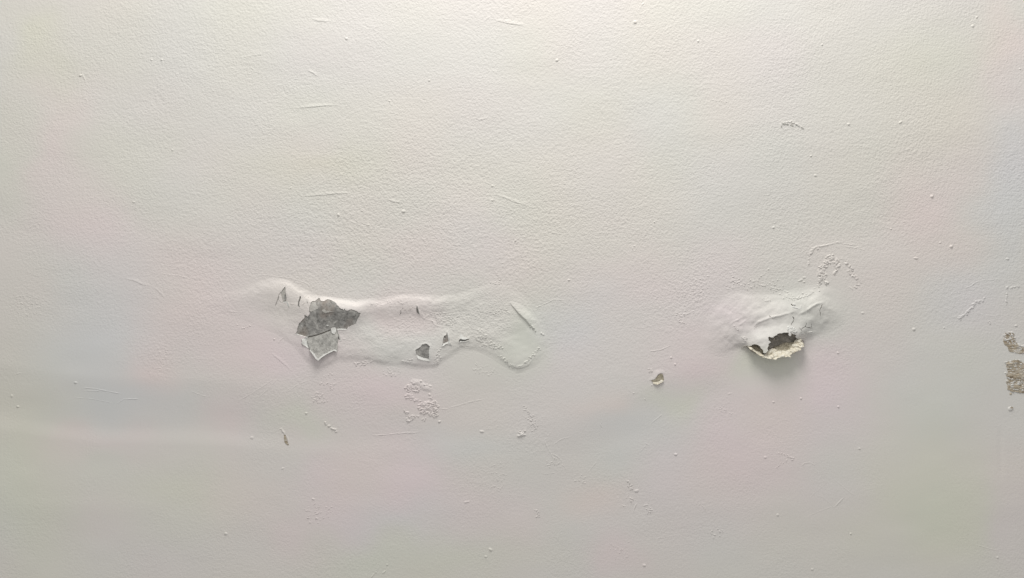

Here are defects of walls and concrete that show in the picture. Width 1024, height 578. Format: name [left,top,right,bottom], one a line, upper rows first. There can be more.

peeling [296,295,360,361]
peeling [416,333,469,361]
spalling [648,368,666,386]
spalling [1002,331,1024,393]